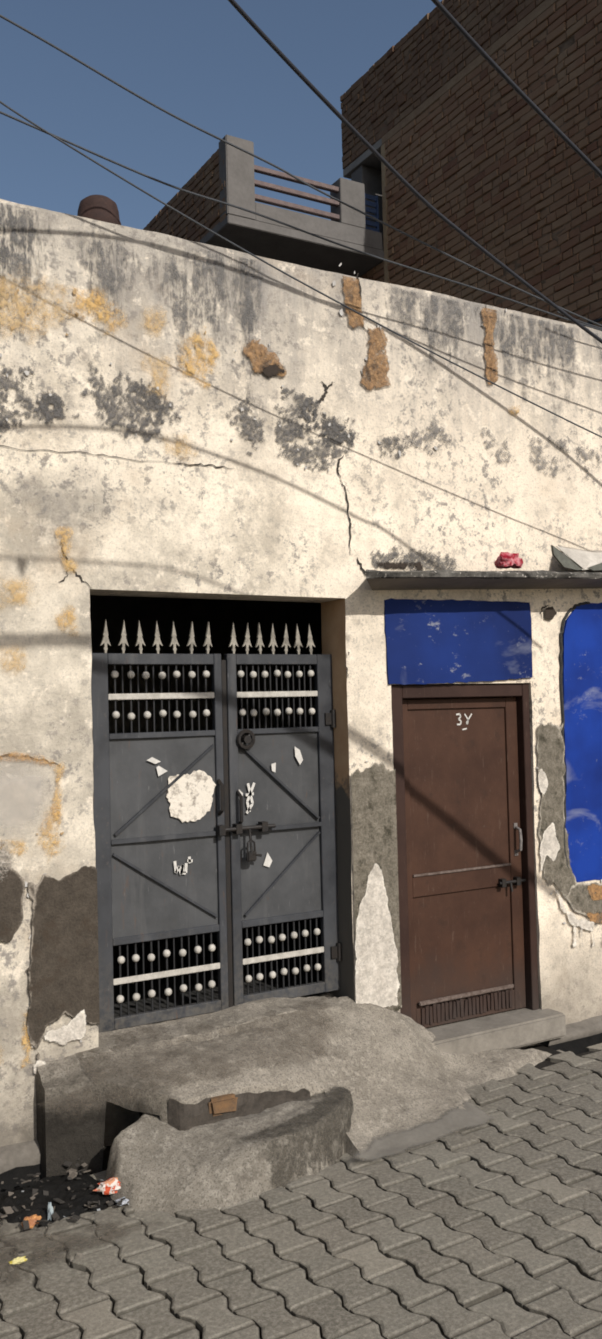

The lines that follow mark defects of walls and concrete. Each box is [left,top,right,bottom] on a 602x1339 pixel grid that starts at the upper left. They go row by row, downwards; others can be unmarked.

crack [0,445,233,469]
water stain [0,203,262,455]
flaking render [233,339,287,388]
water stain [226,387,356,471]
crack [315,382,335,403]
crack [337,455,366,576]
flaking render [332,263,391,390]
water stain [378,420,452,459]
flaking render [481,307,507,385]
peeling [351,754,402,1011]
peeling [536,722,602,947]
peeling [0,841,100,1075]